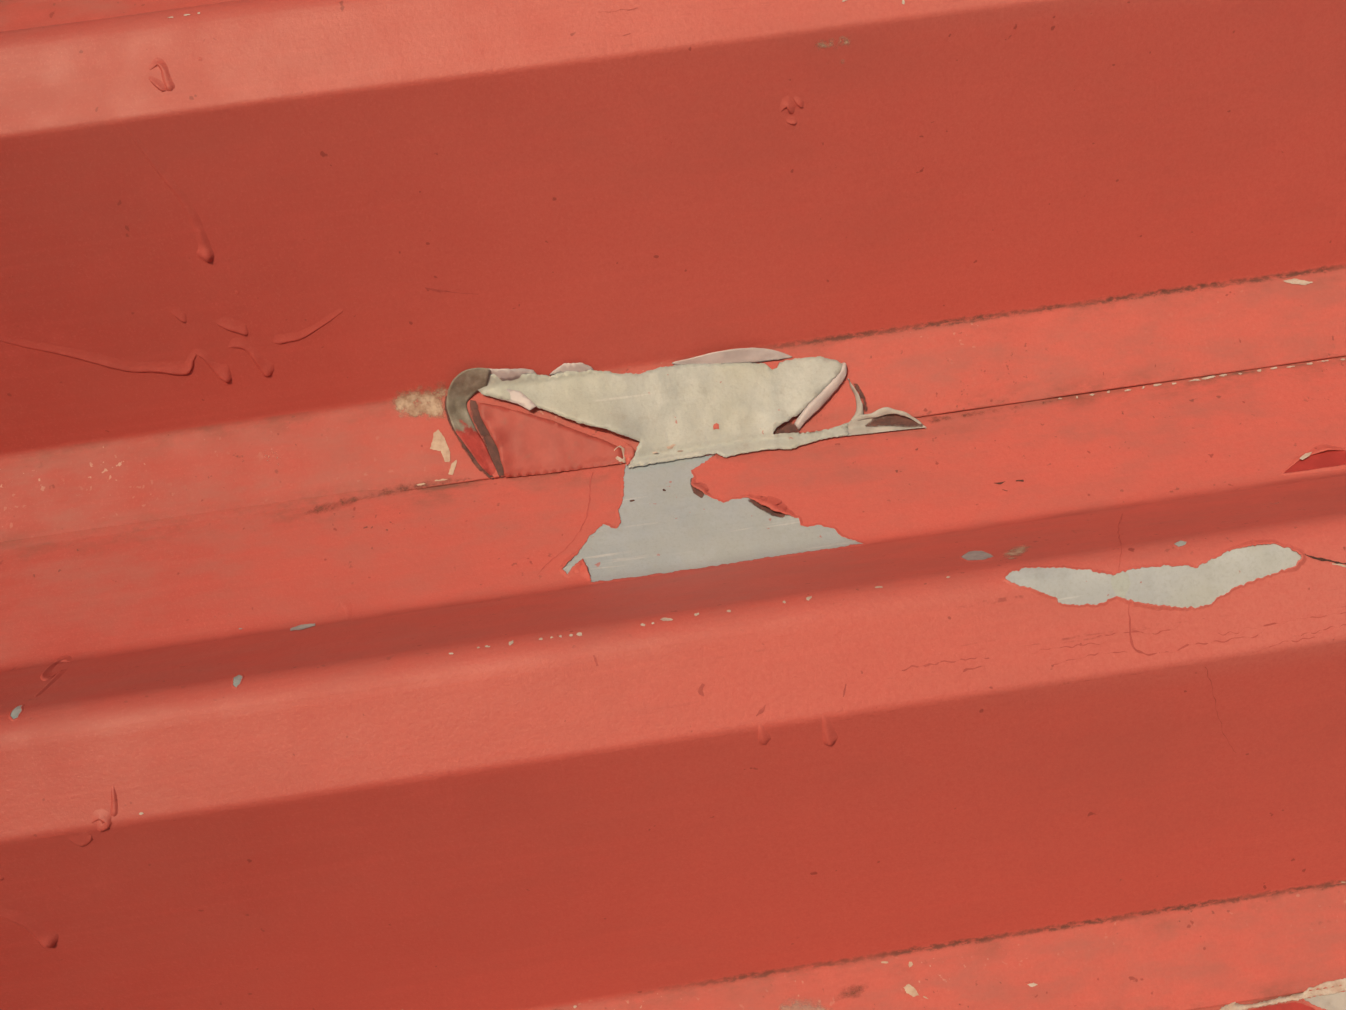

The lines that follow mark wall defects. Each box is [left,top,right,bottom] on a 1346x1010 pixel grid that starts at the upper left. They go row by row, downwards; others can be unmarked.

peeling [417,347,927,585]
peeling [1281,444,1346,475]
peeling [1003,540,1307,611]